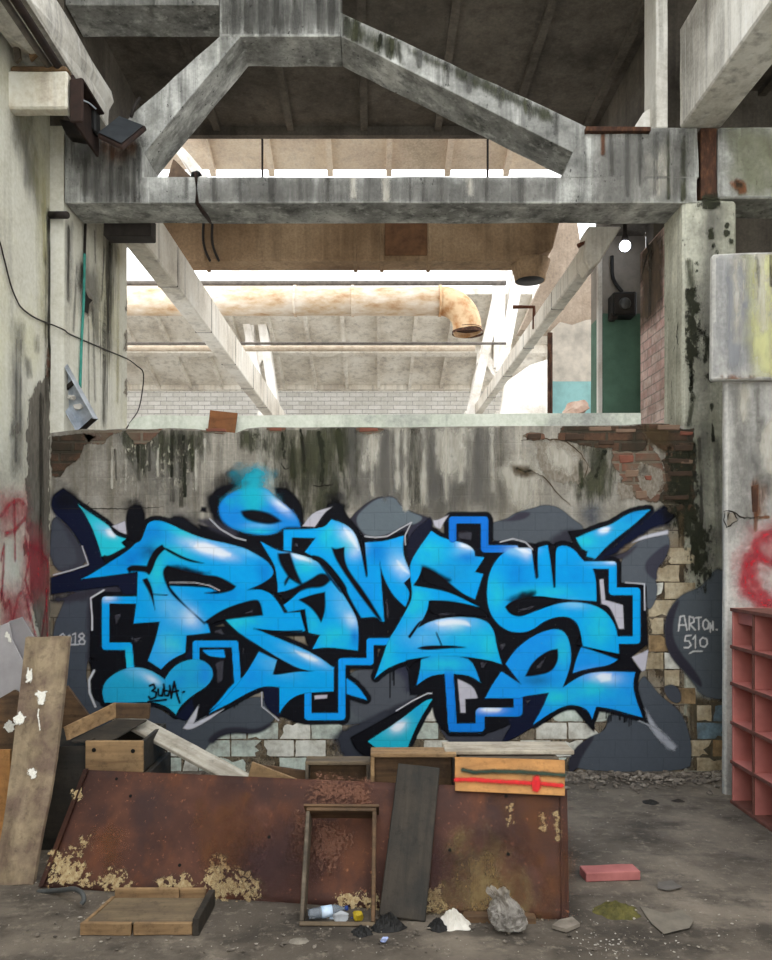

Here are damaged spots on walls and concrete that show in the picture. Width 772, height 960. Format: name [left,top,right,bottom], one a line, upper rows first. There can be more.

corrosion [584,126,651,134]
flaking render [15,344,162,637]
damp [114,429,206,507]
damp [281,428,306,479]
damp [317,429,493,509]
flaking render [523,424,700,519]
peeling [633,548,722,771]